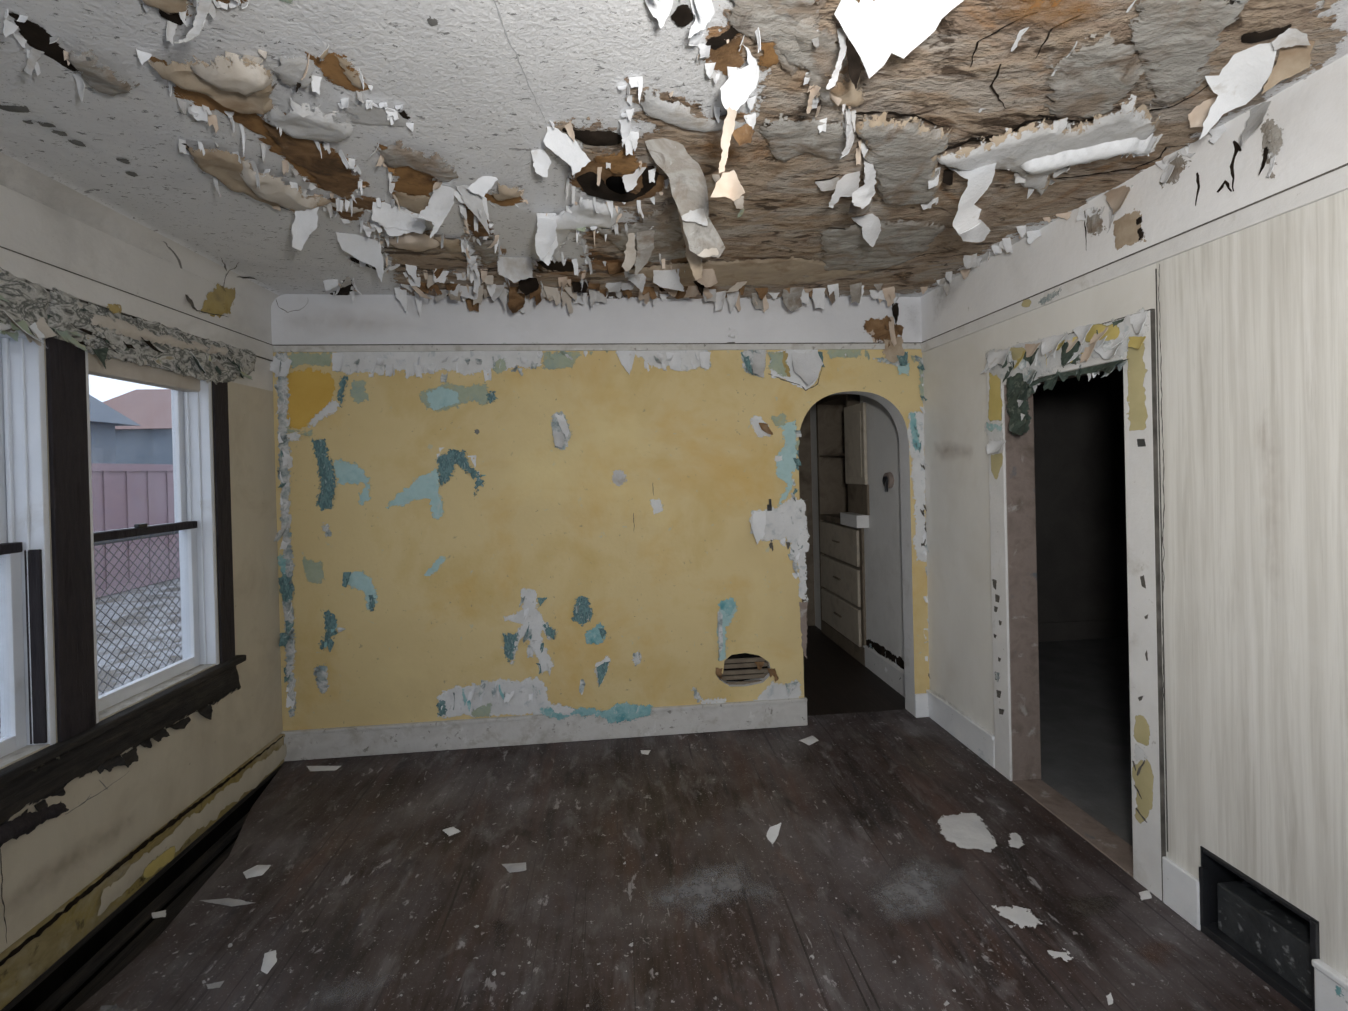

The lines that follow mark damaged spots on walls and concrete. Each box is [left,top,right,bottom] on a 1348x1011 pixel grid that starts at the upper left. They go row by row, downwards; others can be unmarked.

spalling [0,105,86,147]
peeling [136,0,1348,576]
peeling [0,267,711,724]
spalling [749,413,810,658]
peeling [91,704,213,774]
spalling [691,598,802,704]
peeling [866,639,904,680]
spalling [992,579,1002,638]
spalling [995,657,1004,715]
peeling [1132,696,1154,824]
crack [0,736,283,966]
peeling [98,743,287,916]